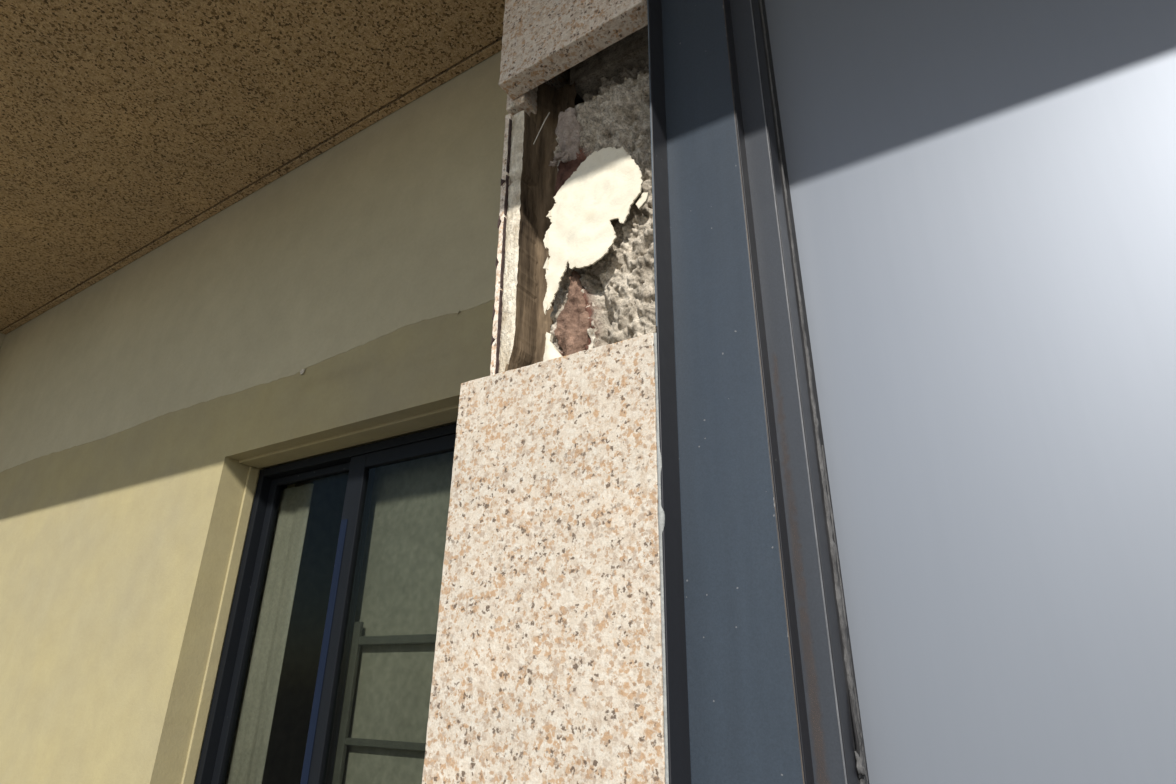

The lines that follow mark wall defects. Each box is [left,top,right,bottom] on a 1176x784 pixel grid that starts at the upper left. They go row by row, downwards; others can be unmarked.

spalling [528,25,657,364]